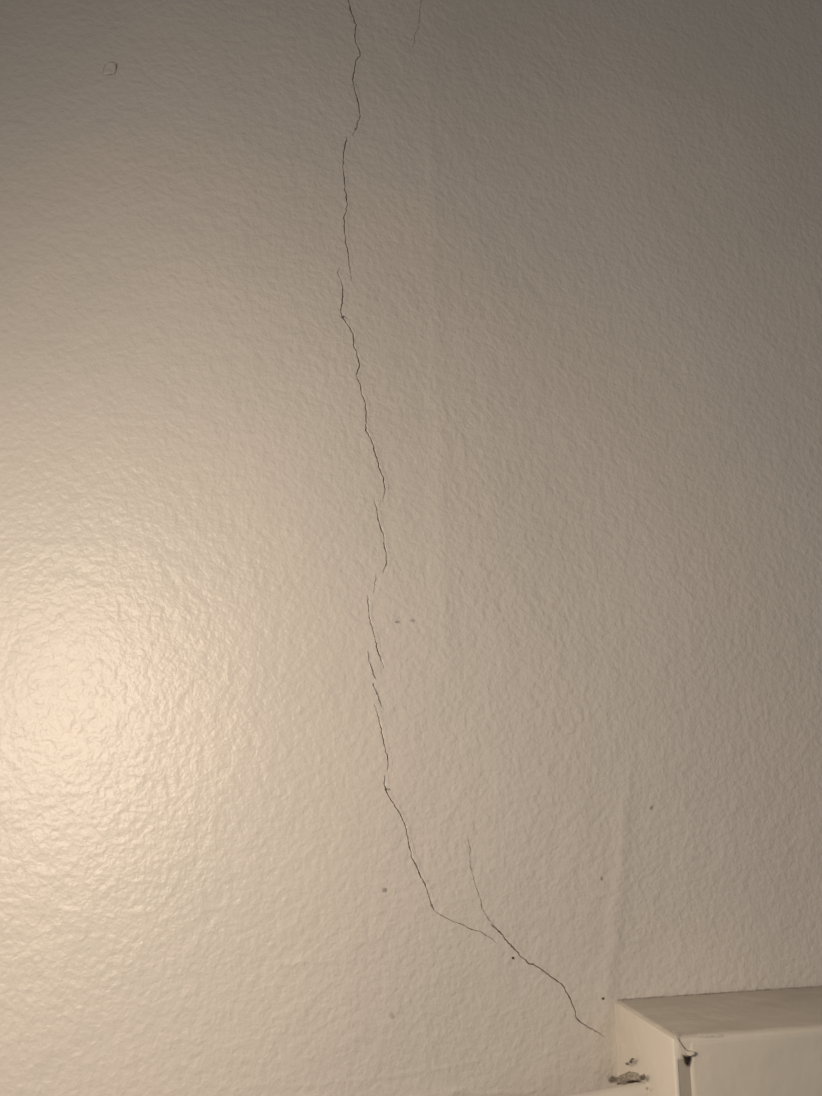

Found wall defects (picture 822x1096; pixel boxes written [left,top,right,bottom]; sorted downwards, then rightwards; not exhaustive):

crack [337,0,607,1036]